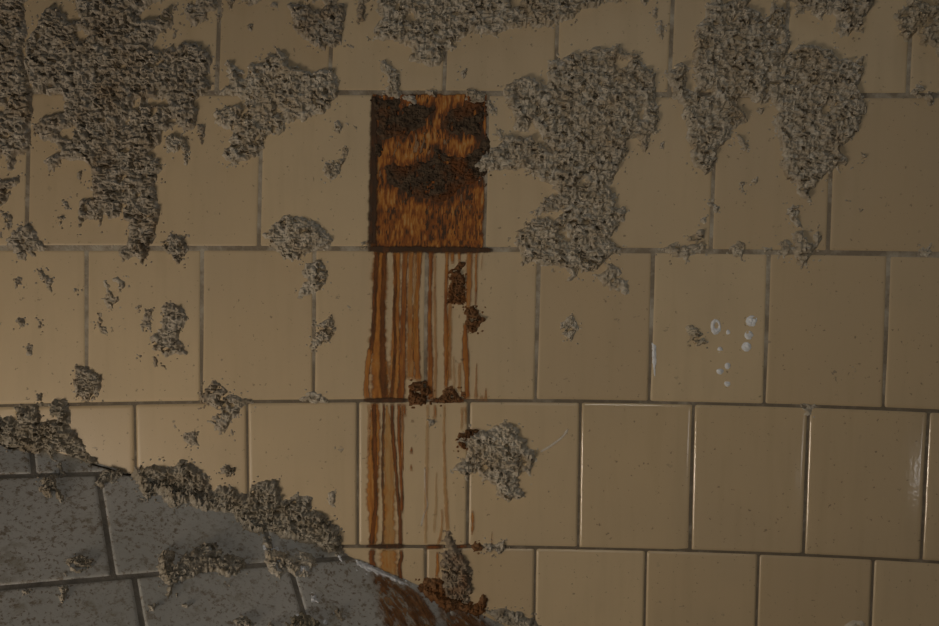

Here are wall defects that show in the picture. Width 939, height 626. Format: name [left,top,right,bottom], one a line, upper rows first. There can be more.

peeling [0,210,13,230]
corrosion [363,81,492,626]
peeling [174,425,200,451]
peeling [216,464,236,480]